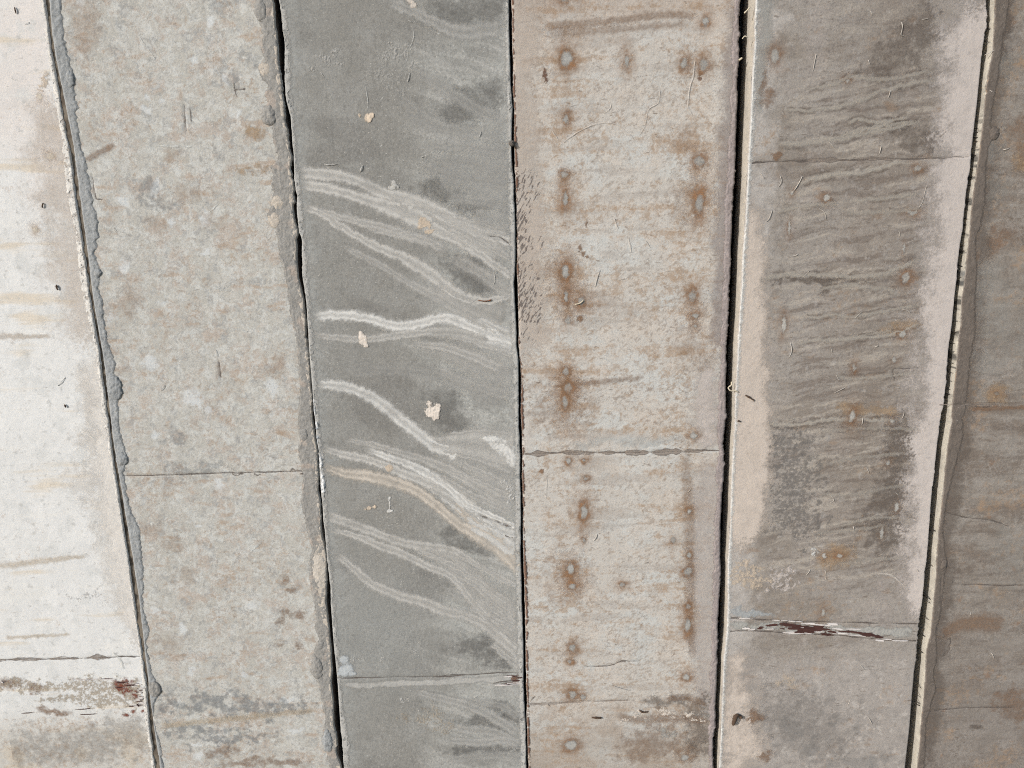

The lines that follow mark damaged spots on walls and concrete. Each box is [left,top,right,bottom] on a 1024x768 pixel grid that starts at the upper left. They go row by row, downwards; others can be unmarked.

rust [558,46,577,71]
rust [691,185,706,222]
rust [558,260,586,322]
damp [730,0,988,622]
rust [561,366,577,412]
rust [577,499,590,524]
rust [564,561,578,590]
peeling [0,459,155,768]
spalling [739,618,908,642]